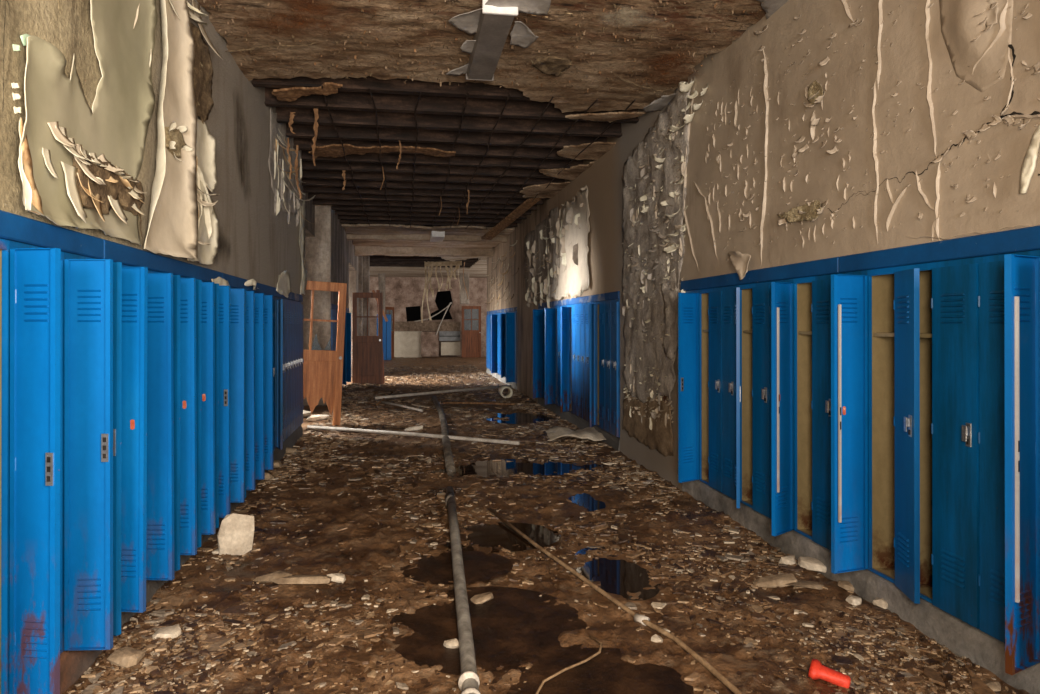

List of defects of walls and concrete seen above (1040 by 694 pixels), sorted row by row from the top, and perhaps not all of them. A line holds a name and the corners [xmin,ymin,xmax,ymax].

spalling [971,0,1032,42]
peeling [11,0,220,264]
spalling [268,107,315,298]
peeling [485,185,590,310]
spalling [621,14,922,457]
peeling [986,124,1040,194]